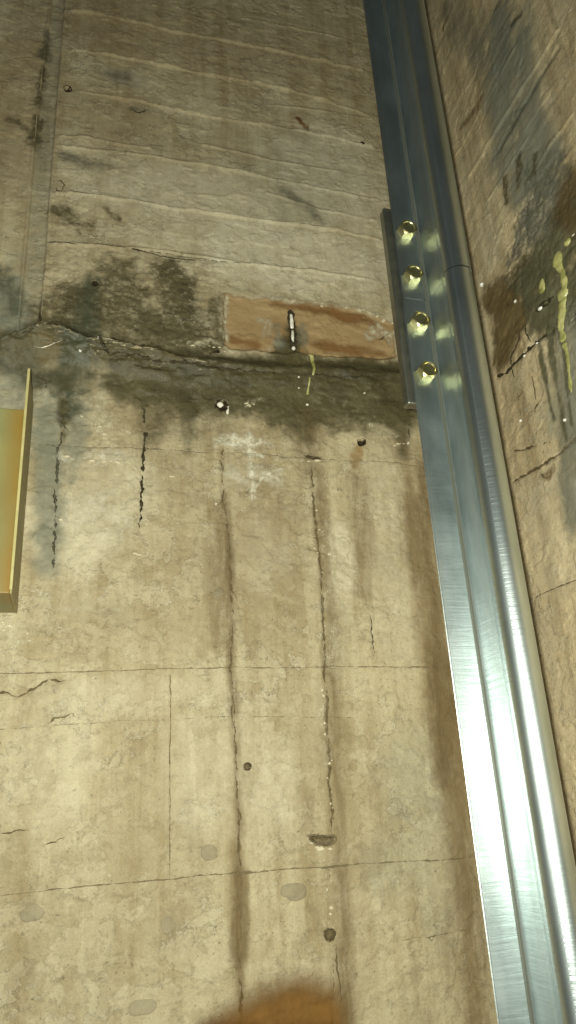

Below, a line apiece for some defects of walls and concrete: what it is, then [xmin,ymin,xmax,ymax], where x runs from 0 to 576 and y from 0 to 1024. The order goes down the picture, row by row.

leakage [0,260,223,395]
crack [68,328,386,378]
leakage [84,326,417,451]
crack [497,325,555,409]
leakage [483,172,576,532]
crack [0,399,468,1017]
spalling [307,834,337,852]